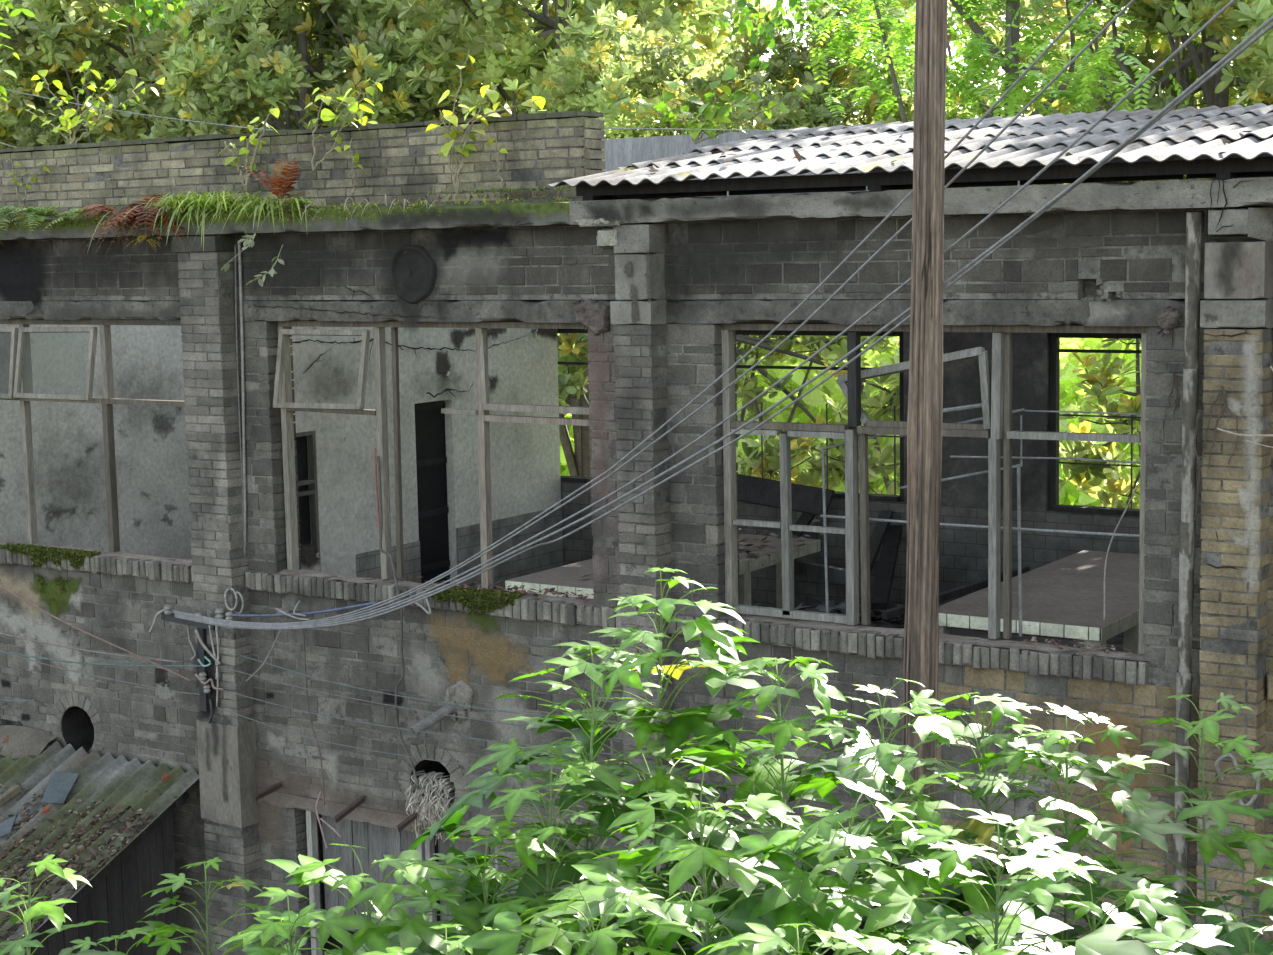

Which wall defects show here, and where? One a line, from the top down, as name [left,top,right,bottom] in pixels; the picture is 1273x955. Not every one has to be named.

damp [3,286,39,304]
crack [252,286,529,374]
spalling [572,299,611,336]
crack [426,383,474,398]
damp [1233,344,1257,446]
damp [1235,462,1257,584]
damp [0,571,81,682]